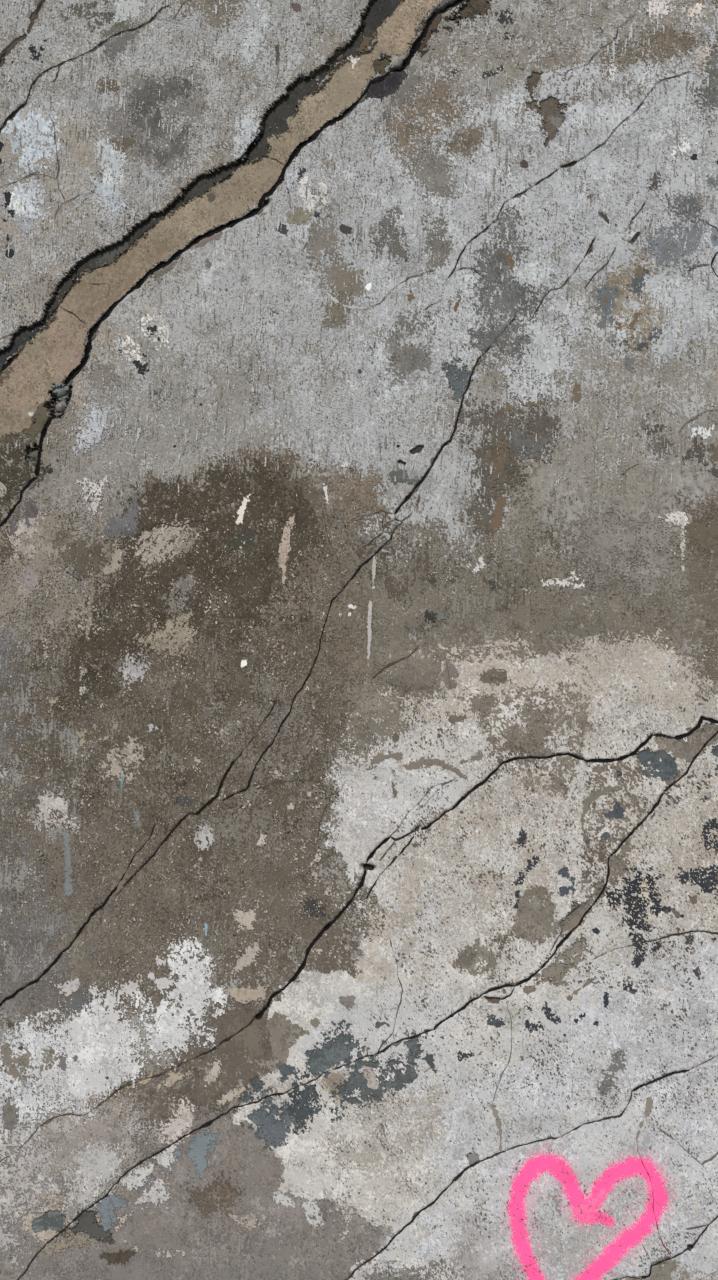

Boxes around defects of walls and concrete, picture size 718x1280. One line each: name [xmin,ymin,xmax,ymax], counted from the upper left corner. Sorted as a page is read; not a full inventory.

crack [0,0,466,526]
crack [372,71,693,310]